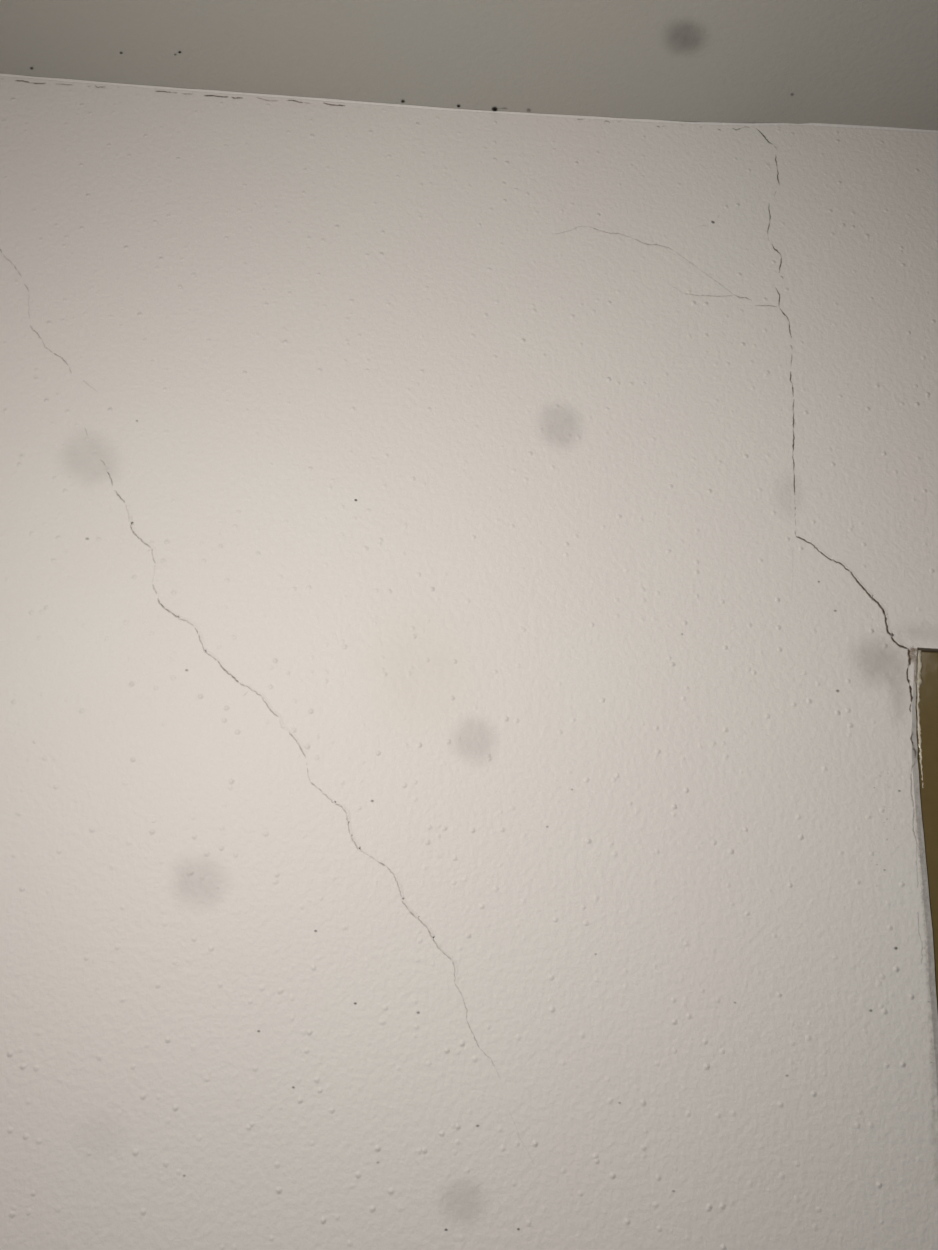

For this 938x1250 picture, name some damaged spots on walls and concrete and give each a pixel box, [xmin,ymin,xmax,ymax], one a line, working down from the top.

crack [127,504,309,758]
crack [796,533,916,756]
crack [319,786,458,983]